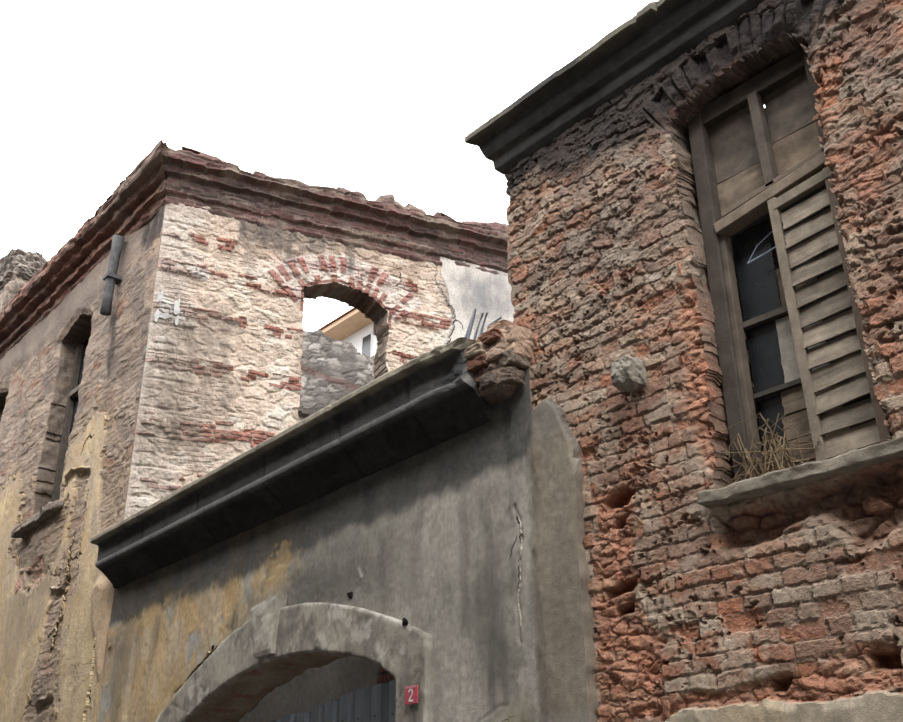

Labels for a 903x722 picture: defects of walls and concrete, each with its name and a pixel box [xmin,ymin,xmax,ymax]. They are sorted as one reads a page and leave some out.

spalling [812,58,894,352]
spalling [463,318,535,405]
spalling [668,263,717,488]
peeling [0,412,114,722]
crack [510,507,523,643]
spalling [583,480,903,722]
spalling [715,466,903,553]